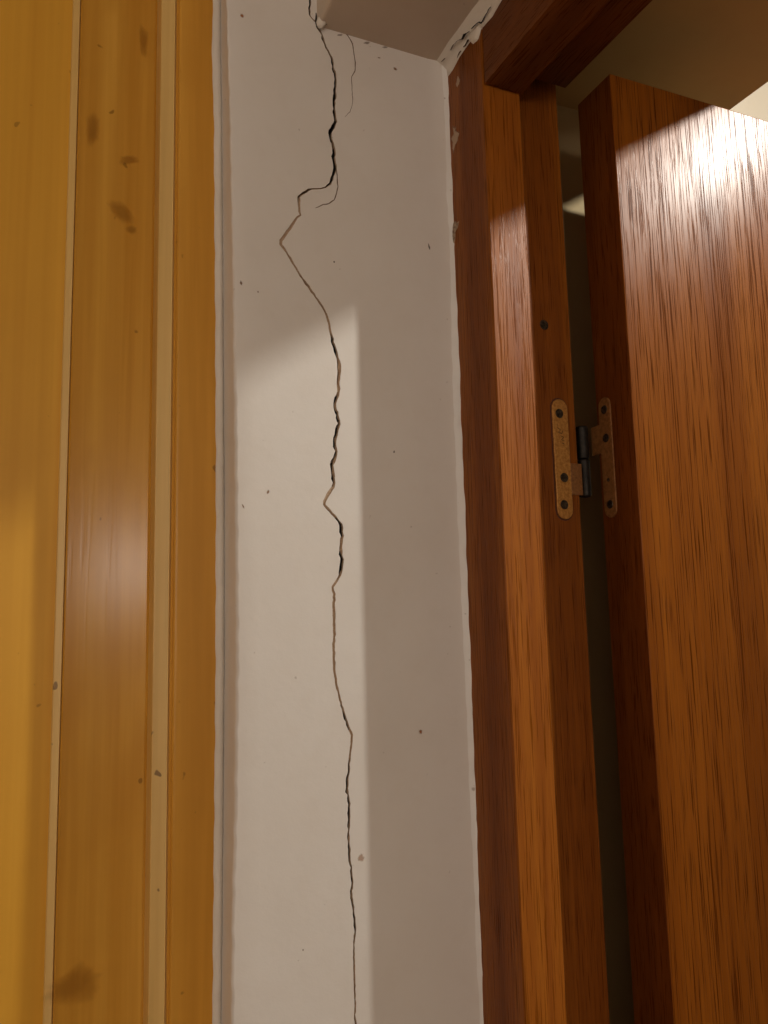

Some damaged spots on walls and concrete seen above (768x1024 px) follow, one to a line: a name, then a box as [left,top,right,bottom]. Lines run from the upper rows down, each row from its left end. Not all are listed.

crack [279,0,357,1024]